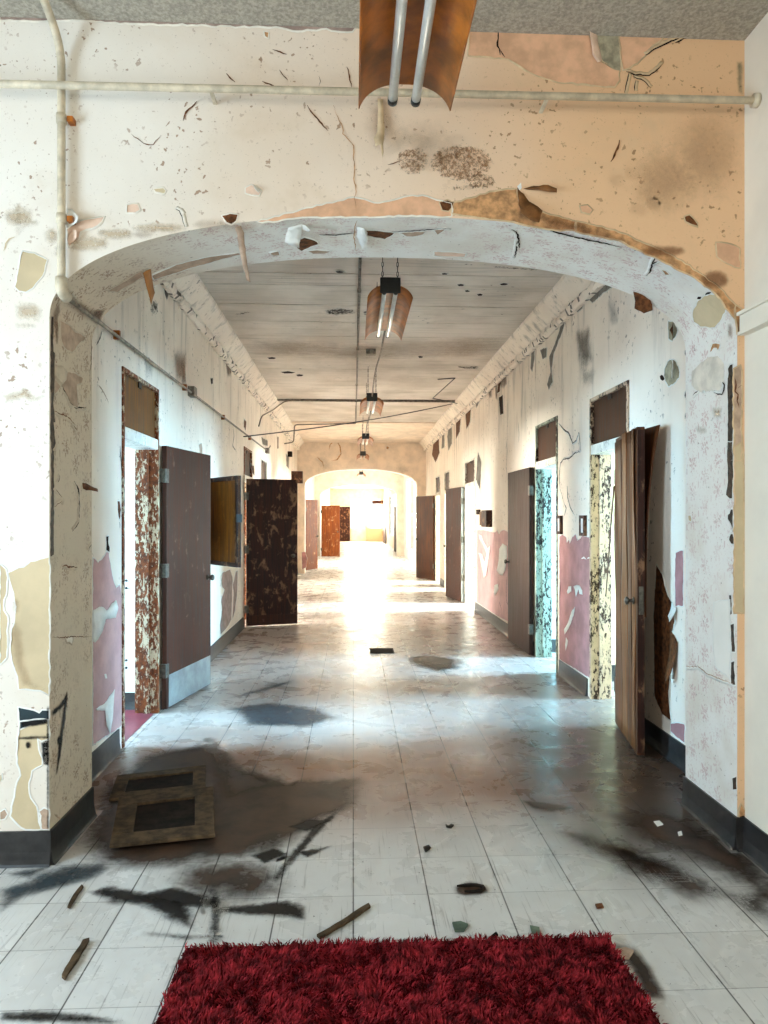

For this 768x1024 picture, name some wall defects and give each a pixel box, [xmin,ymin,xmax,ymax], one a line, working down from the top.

peeling [467,31,664,88]
crack [624,38,686,94]
crack [319,105,357,247]
damp [397,146,494,190]
peeling [257,183,742,335]
crack [510,229,621,258]
peeling [0,556,51,696]
peeling [92,535,122,746]
peeling [477,529,508,622]
peeling [559,534,589,678]
peeling [653,550,685,743]
peeling [0,706,51,831]